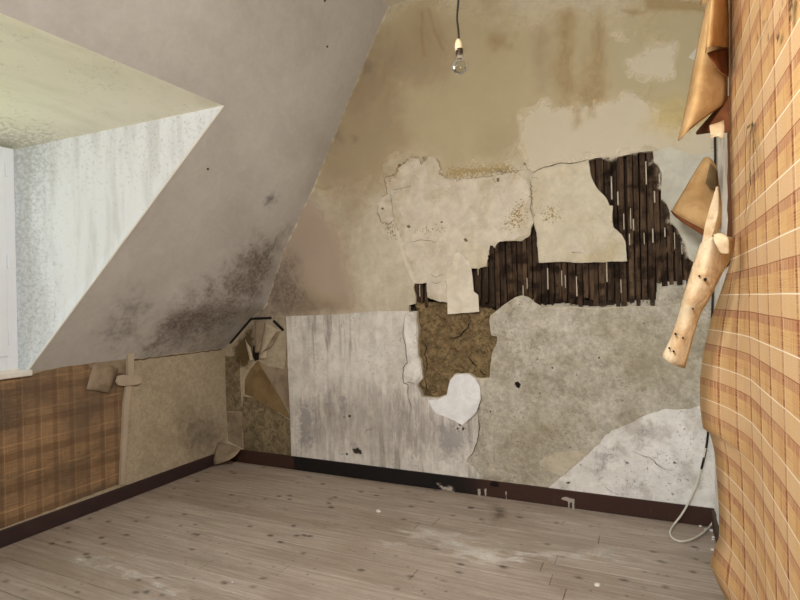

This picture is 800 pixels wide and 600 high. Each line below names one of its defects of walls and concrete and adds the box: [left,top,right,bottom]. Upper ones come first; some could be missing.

damp [318,0,706,188]
damp [259,201,352,314]
flaking render [286,92,719,551]